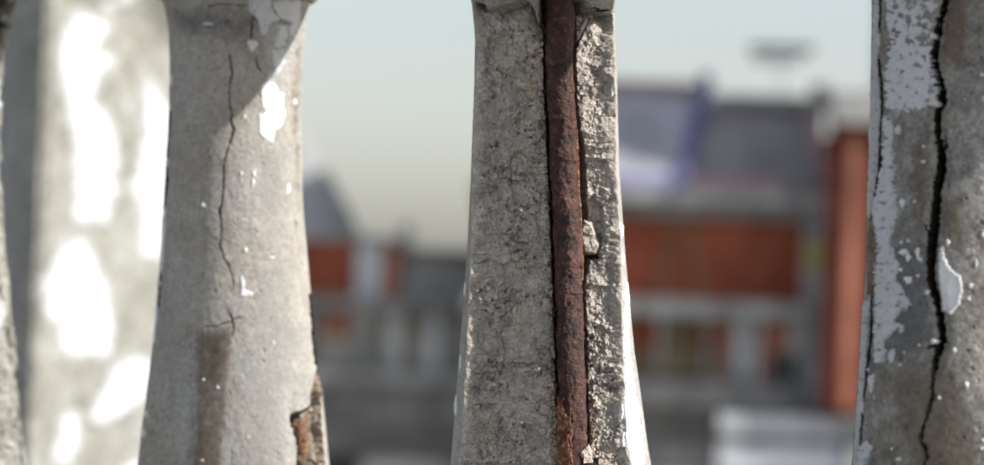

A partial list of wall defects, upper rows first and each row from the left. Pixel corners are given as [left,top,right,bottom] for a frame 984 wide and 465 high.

peeling [0,21,27,333]
water stain [194,332,231,465]
crack [205,3,261,335]
peeling [247,0,301,144]
spalling [290,370,325,465]
spalling [454,0,559,465]
rust [531,0,559,464]
rust [584,253,599,460]
spalling [574,0,645,465]
peeling [853,0,945,465]
crack [918,0,952,459]
peeling [925,239,973,314]